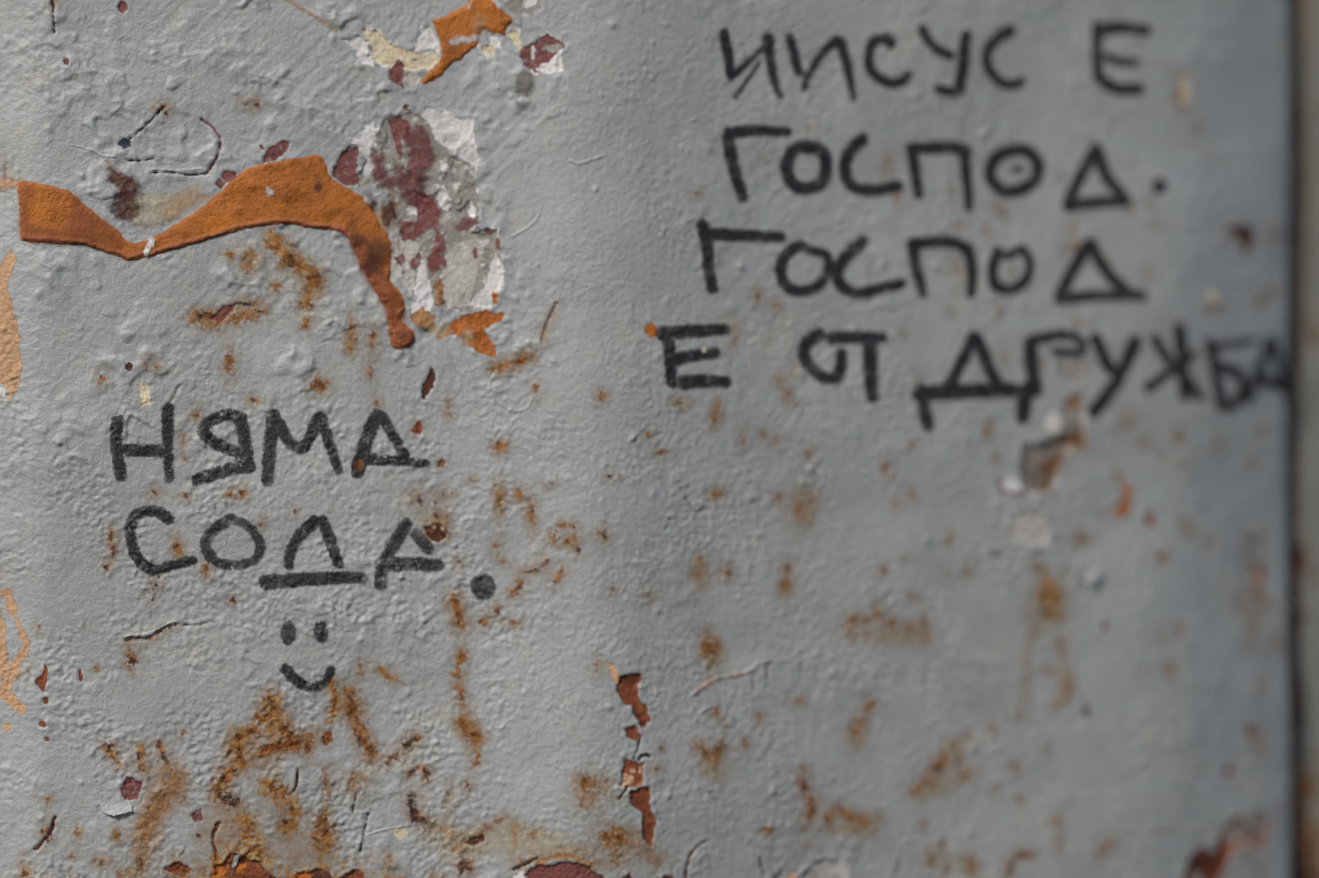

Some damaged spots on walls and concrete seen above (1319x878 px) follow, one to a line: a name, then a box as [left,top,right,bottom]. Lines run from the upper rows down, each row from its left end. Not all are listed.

peeling [259,140,290,163]
peeling [215,170,237,189]
peeling [333,0,565,358]
peeling [125,362,159,408]
peeling [996,355,1088,497]
peeling [351,459,365,472]
corrosion [93,648,539,878]
corrosion [577,774,608,810]
corrosion [597,823,635,878]